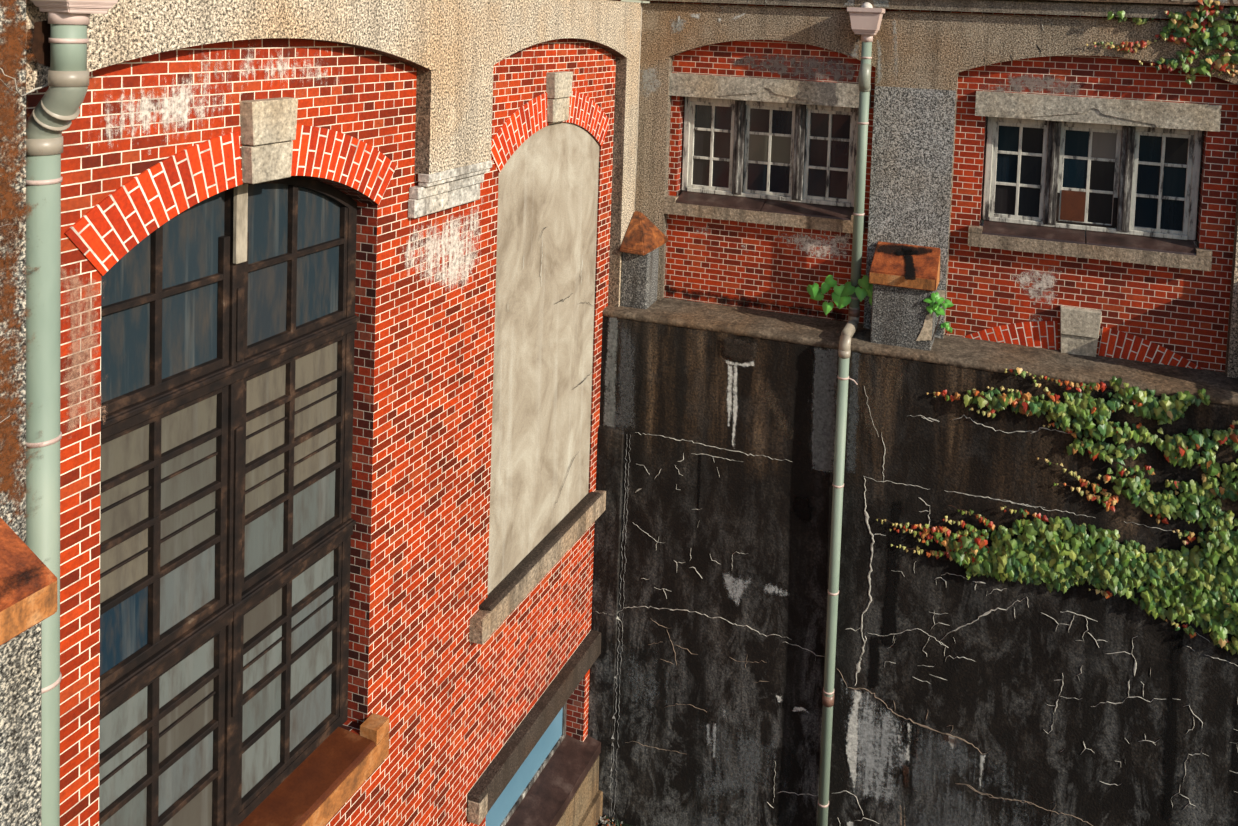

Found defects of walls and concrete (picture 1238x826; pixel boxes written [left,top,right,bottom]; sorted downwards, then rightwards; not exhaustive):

corrosion [0,0,34,522]
efflorescence [405,209,480,287]
damp [603,317,635,433]
efflorescence [726,361,754,445]
damp [812,348,877,473]
efflorescence [724,574,748,604]
crack [596,387,1238,812]
damp [846,501,1027,826]
damp [703,711,777,826]
crack [767,763,879,826]
crack [955,783,1093,826]
damp [1162,633,1183,820]